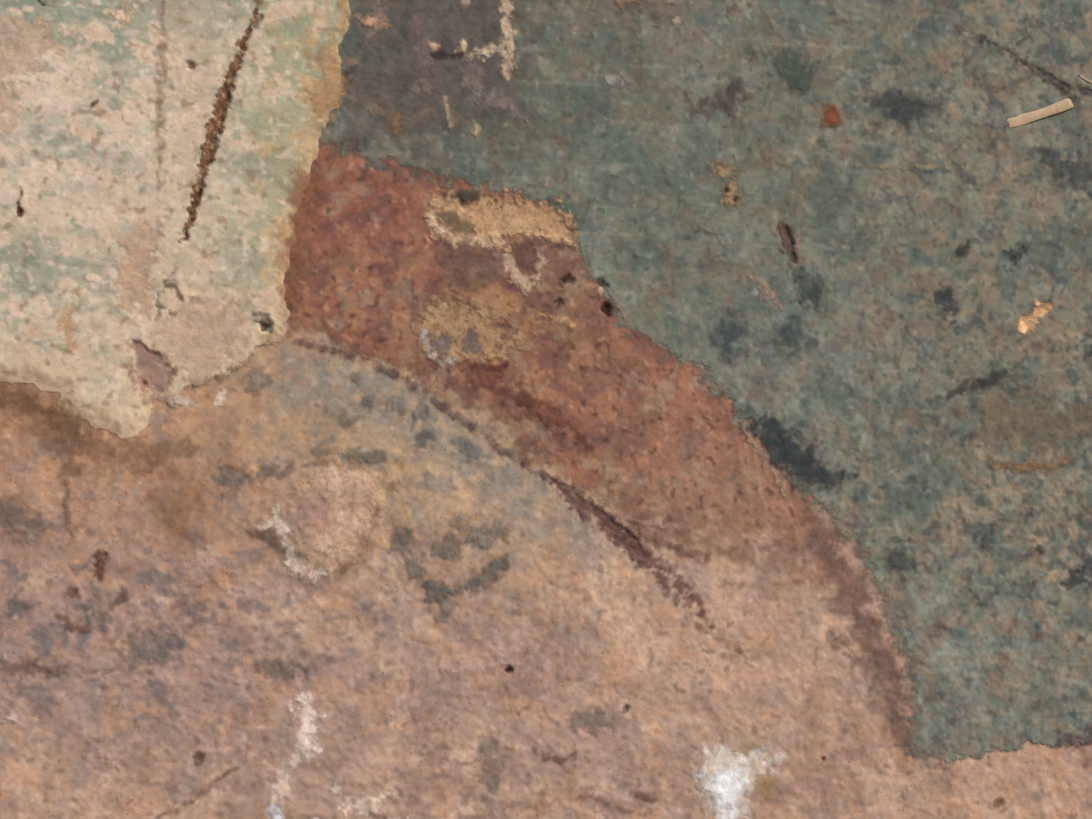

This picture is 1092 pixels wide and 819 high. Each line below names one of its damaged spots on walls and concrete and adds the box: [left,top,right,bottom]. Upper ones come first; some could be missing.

peeling [362,16,388,29]
crack [179,0,264,242]
spalling [423,183,579,295]
spalling [253,312,274,333]
spalling [411,296,528,373]
spalling [129,339,193,408]
spalling [214,389,227,406]
water stain [267,692,332,819]
water stain [332,781,410,819]
water stain [688,738,784,819]